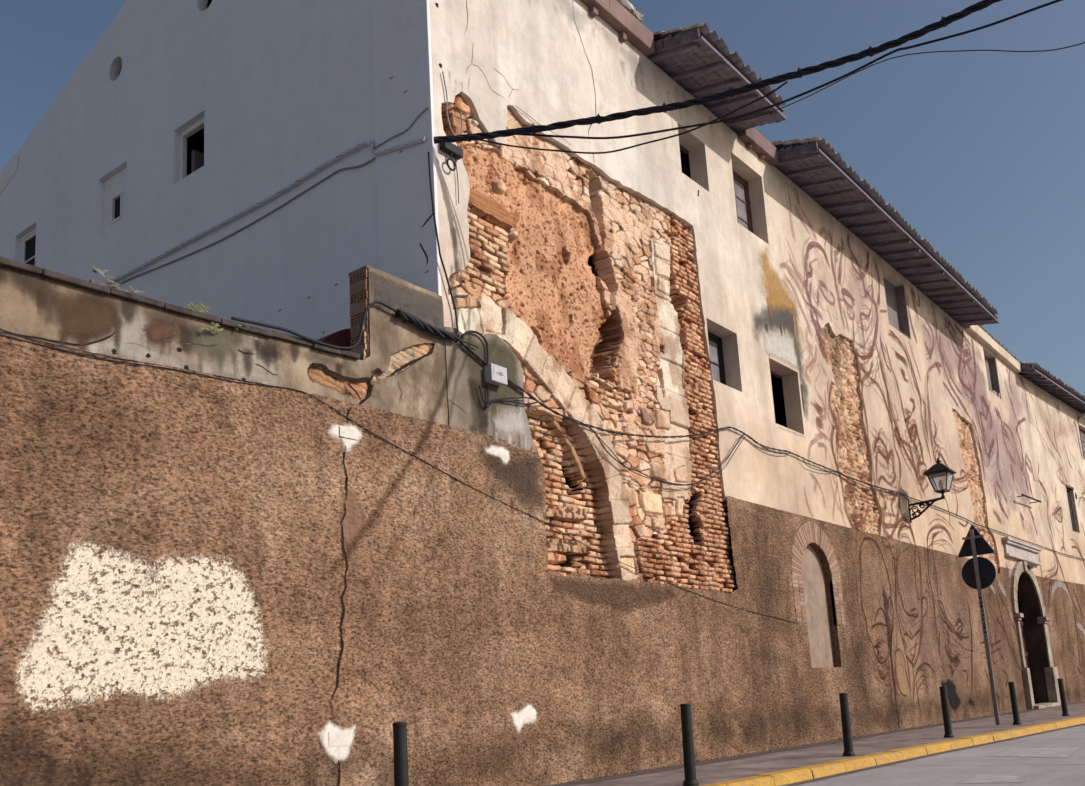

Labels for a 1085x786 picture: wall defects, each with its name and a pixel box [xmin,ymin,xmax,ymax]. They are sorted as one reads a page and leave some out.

crack [464,0,596,163]
water stain [0,266,53,329]
water stain [90,302,177,369]
water stain [181,329,278,384]
flaking render [307,344,433,402]
crack [309,344,435,417]
spalling [441,96,736,593]
water stain [761,254,797,367]
spalling [820,323,880,535]
spalling [952,410,998,573]
crack [331,446,349,716]